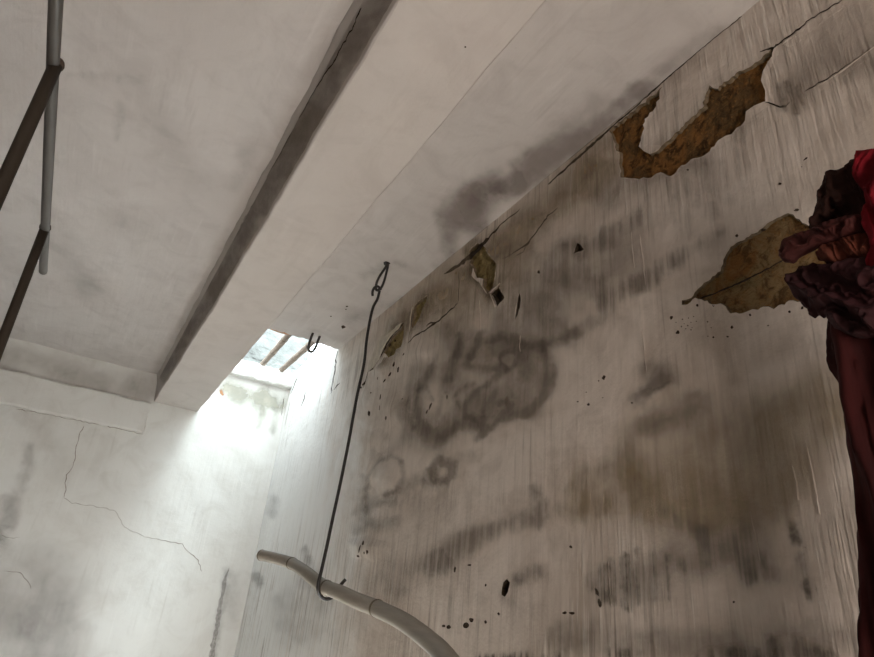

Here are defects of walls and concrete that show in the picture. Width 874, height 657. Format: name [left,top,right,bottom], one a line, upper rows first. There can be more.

crack [549,16,742,184]
spalling [608,46,777,181]
crack [760,0,845,52]
crack [806,46,874,97]
peeling [363,295,428,387]
crack [408,210,519,343]
damp [411,336,546,447]
spalling [469,243,505,307]
spalling [670,209,826,338]
crack [18,409,201,570]